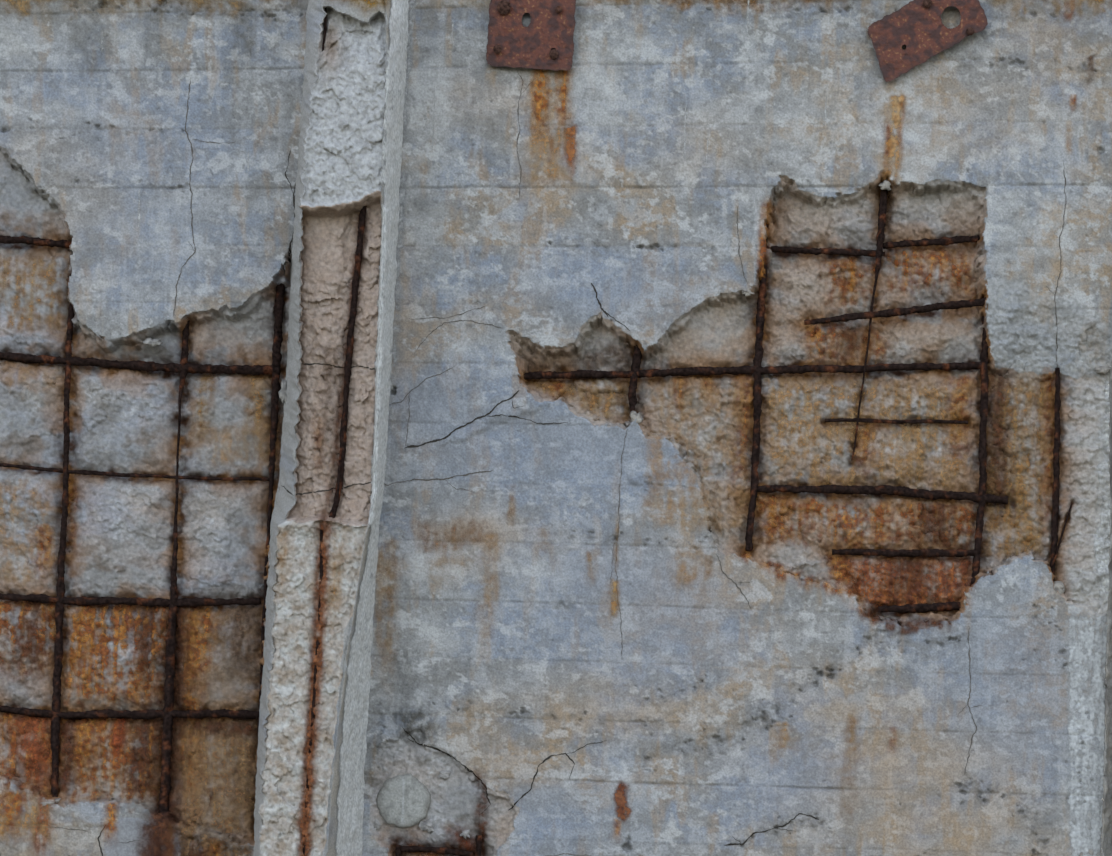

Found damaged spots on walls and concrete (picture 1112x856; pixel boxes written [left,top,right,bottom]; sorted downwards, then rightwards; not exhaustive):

corrosion [530,69,576,178]
crack [591,283,630,331]
spalling [0,0,521,856]
crack [304,362,375,370]
crack [281,470,493,499]
crack [390,366,567,448]
spalling [505,169,1112,856]
corrosion [758,495,975,634]
corrosion [767,375,969,487]
corrosion [297,523,336,856]
crack [402,727,603,813]
corrosion [614,782,631,834]